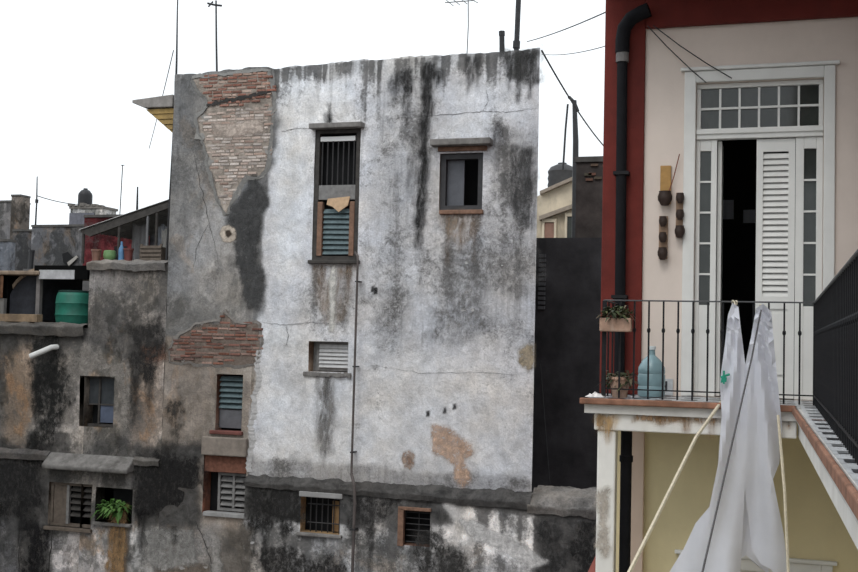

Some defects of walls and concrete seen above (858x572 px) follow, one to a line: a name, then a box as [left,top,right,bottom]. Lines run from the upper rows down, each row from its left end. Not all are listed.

water stain [501,49,541,98]
flaking render [191,68,278,242]
water stain [395,62,441,247]
water stain [509,145,536,222]
water stain [228,175,269,309]
water stain [128,317,166,416]
flaking render [168,309,264,369]
water stain [133,401,205,546]
peeling [402,451,414,470]
peeling [426,411,472,487]
water stain [413,531,467,572]
water stain [459,519,596,572]